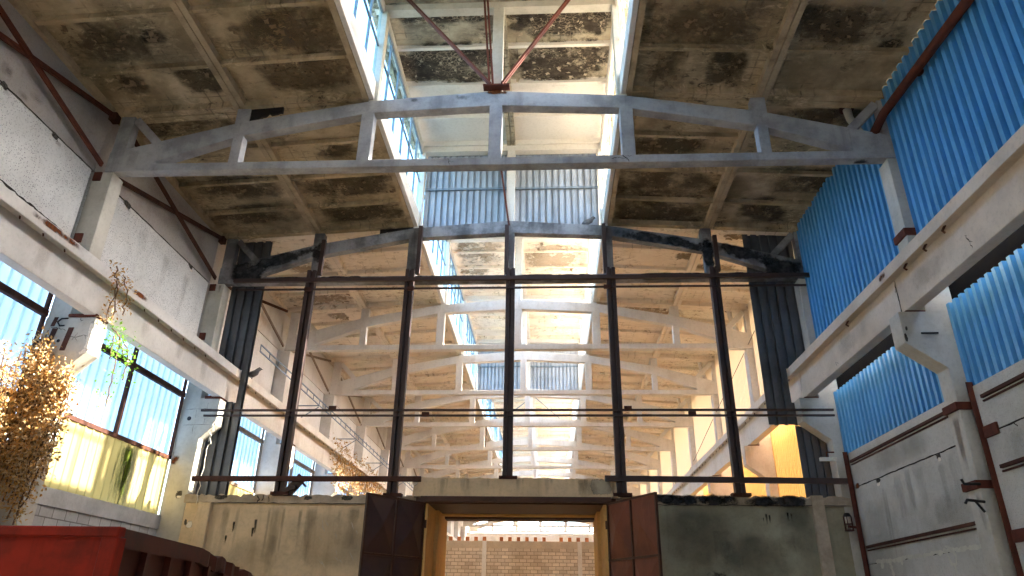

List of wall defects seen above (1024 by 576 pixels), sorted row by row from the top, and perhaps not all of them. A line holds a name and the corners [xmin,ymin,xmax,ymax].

corrosion [35,214,78,247]
damp [657,494,805,521]